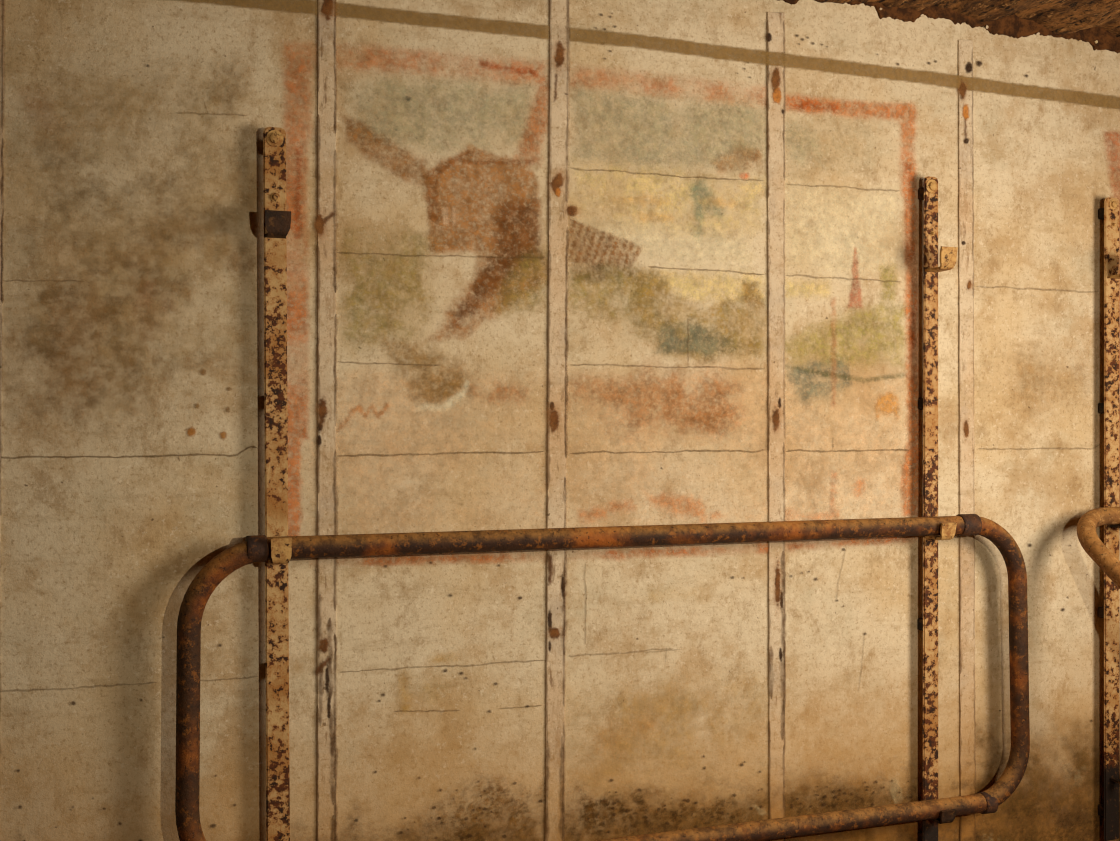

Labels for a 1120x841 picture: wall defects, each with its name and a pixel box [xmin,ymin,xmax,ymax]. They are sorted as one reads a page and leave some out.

rust [322,0,333,20]
peeling [843,1,1120,54]
rust [555,43,564,99]
rust [772,68,784,113]
rust [959,61,982,143]
rust [551,174,563,197]
rust [315,212,334,234]
rust [317,399,327,445]
rust [550,402,559,432]
rust [773,398,781,430]
rust [775,568,783,607]
leakage [566,799,759,841]